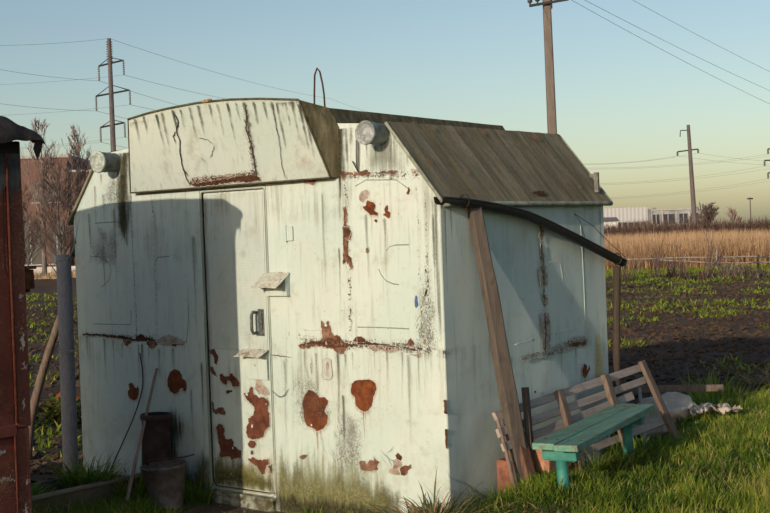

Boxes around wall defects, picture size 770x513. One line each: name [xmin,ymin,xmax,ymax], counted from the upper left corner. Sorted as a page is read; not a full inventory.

damp [209,102,311,142]
crack [173,113,214,185]
damp [113,152,131,242]
rust [362,200,391,223]
rust [342,206,354,270]
peeling [520,226,590,362]
rust [298,320,427,355]
rust [209,348,273,475]
rust [302,389,329,432]
rust [350,379,377,418]
rust [359,457,380,472]
rust [395,453,412,476]